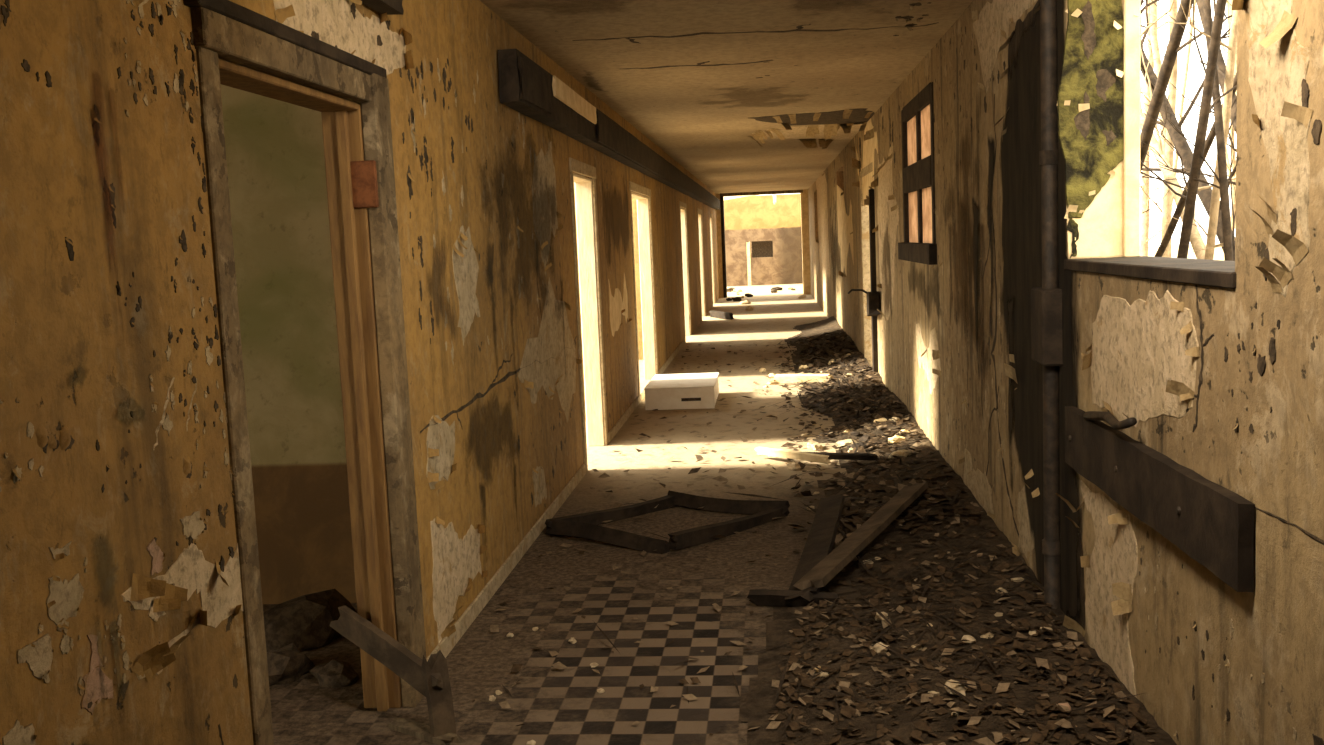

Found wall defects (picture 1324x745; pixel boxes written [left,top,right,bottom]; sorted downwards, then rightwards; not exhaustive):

crack [572,22,939,69]
peeling [273,0,480,365]
peeling [746,106,900,330]
damp [429,243,455,333]
peeling [16,0,243,715]
crack [420,336,577,433]
peeling [1081,290,1200,429]
peeling [430,515,488,644]
peeling [1049,479,1161,698]
crack [1255,507,1324,545]
peeling [2,720,37,745]